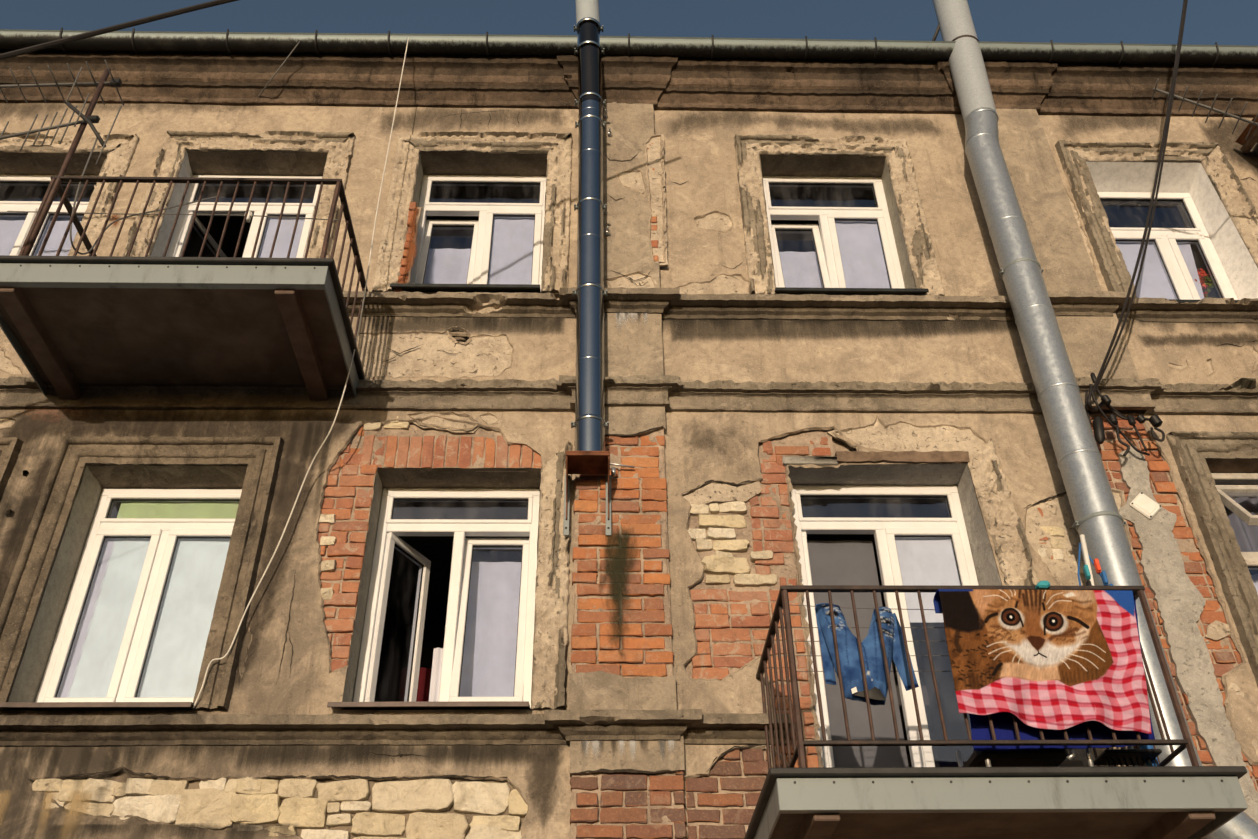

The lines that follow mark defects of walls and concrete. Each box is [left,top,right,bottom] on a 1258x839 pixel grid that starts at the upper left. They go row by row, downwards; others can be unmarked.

flaking render [605,134,668,288]
flaking render [0,417,17,430]
flaking render [354,326,514,379]
flaking render [314,411,542,675]
flaking render [570,415,987,839]
flaking render [1023,491,1087,586]
flaking render [1089,412,1258,823]
flaking render [27,767,532,839]